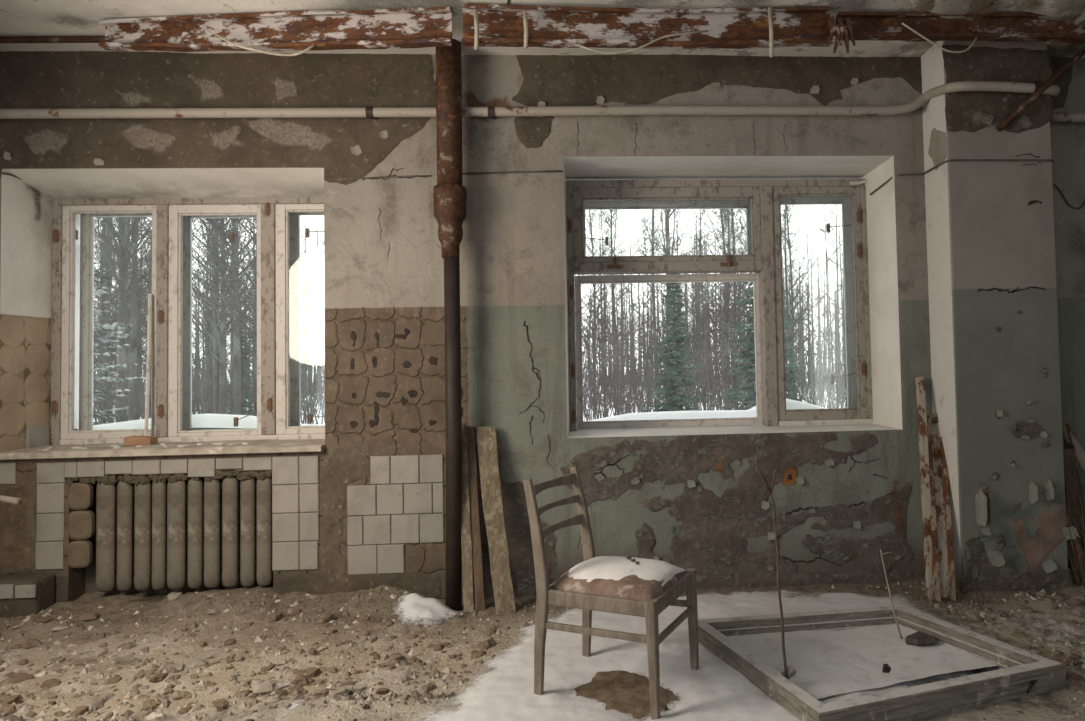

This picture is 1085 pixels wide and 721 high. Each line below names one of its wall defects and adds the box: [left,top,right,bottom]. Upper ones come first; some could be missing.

flaking render [0,51,436,185]
flaking render [512,55,922,148]
flaking render [928,45,1073,171]
spalling [350,390,418,428]
crack [519,321,554,469]
spalling [274,441,442,599]
peeling [560,432,915,589]
peeling [962,479,1080,594]